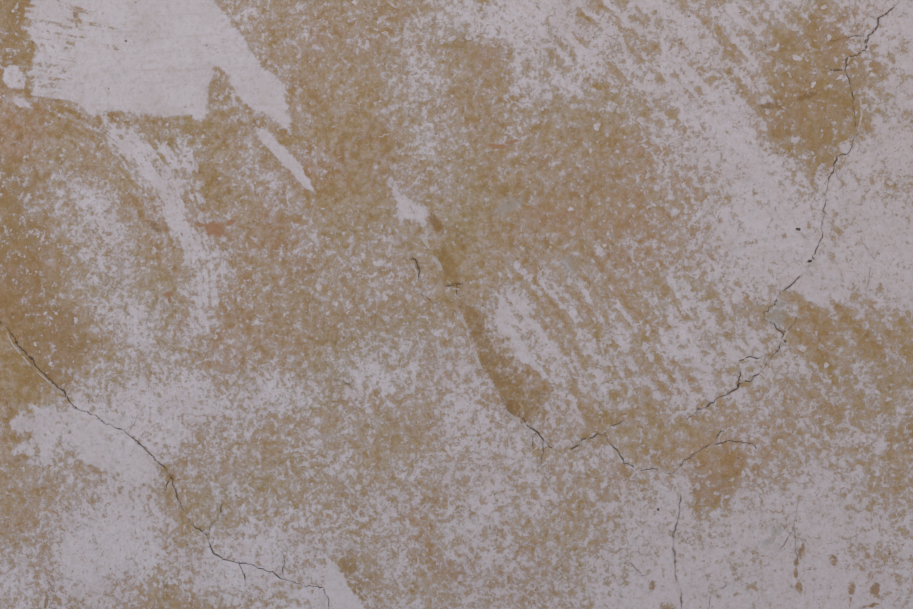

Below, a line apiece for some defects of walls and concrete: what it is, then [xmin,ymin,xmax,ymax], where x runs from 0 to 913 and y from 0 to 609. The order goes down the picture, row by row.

crack [410,259,463,304]
crack [687,7,894,419]
crack [0,322,329,609]
crack [523,419,757,608]
crack [708,485,806,609]